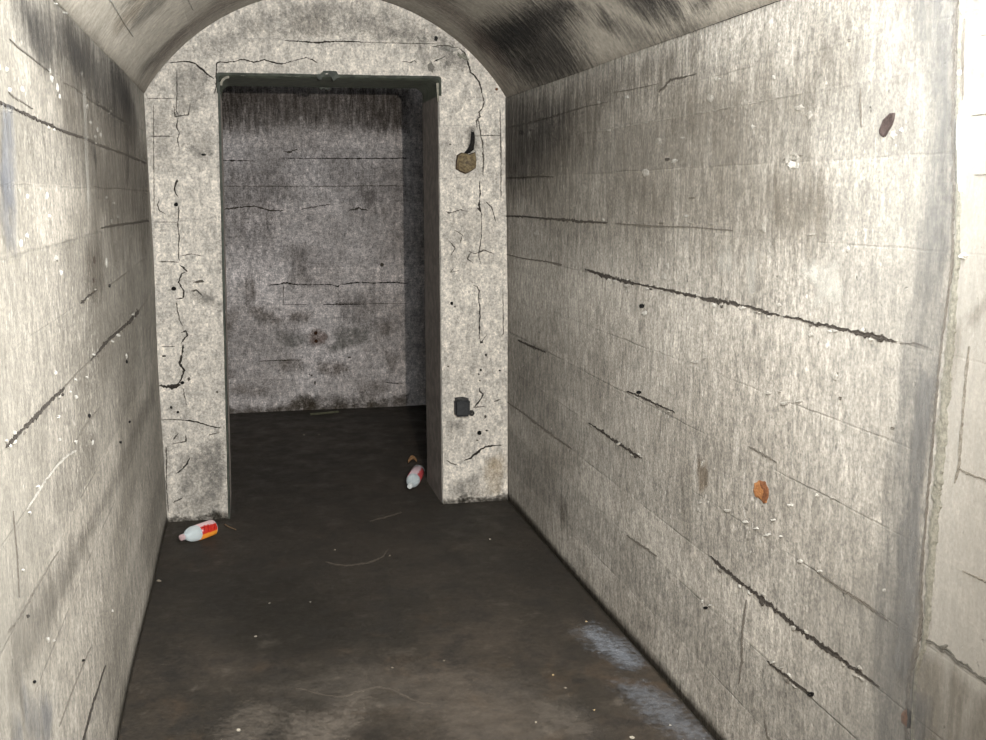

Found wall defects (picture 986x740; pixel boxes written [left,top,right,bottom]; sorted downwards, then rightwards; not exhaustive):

crack [5,300,147,632]
damp [21,0,148,222]
crack [0,39,732,513]
damp [475,0,583,84]
damp [623,0,681,22]
crack [585,0,986,740]